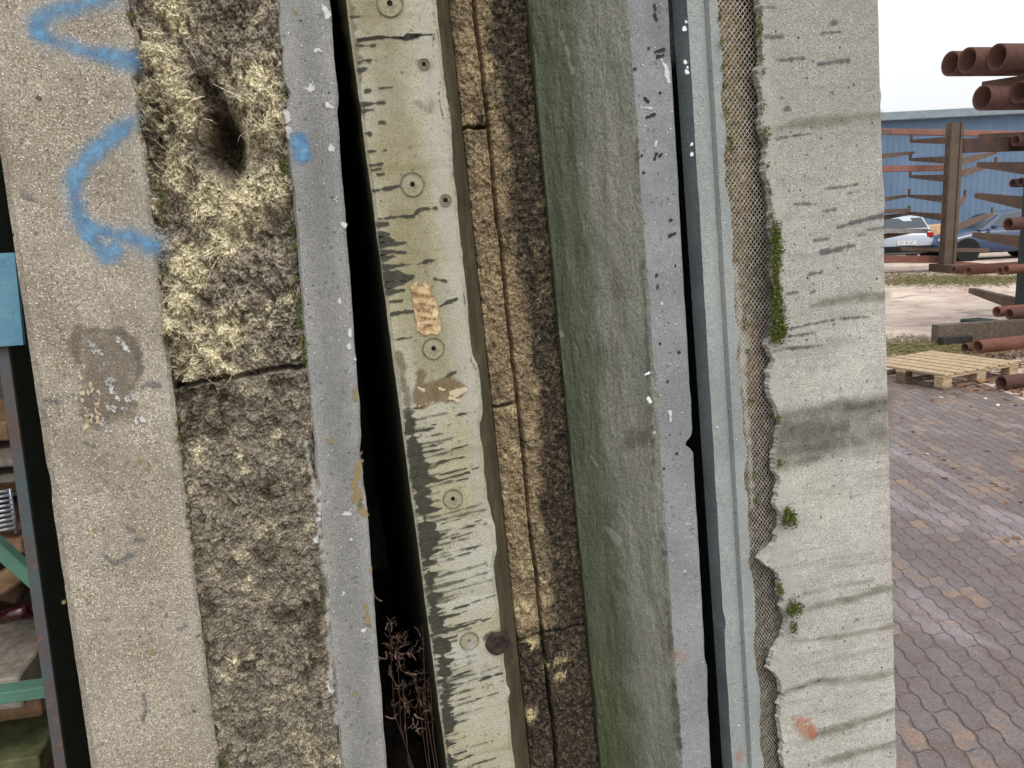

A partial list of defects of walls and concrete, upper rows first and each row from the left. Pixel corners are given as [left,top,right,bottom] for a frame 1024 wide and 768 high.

peeling [413,370,467,409]
water stain [404,406,503,768]
corrosion [485,632,513,681]